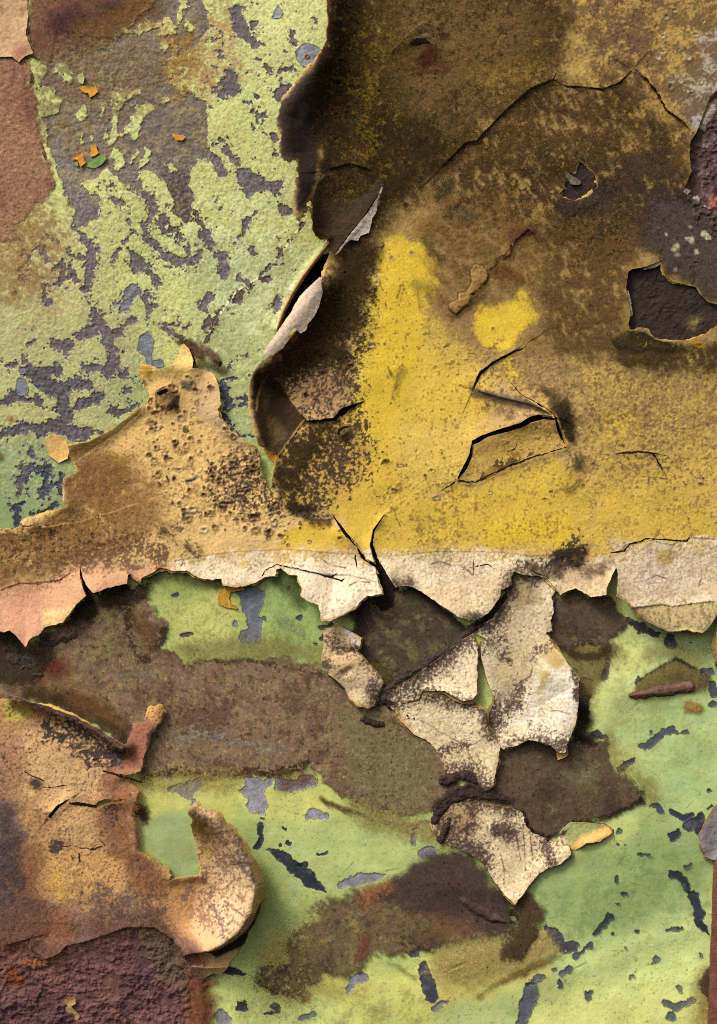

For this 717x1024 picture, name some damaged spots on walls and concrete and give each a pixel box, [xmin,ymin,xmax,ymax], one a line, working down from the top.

crack [443,68,694,167]
leakage [312,0,695,367]
peeling [0,0,717,791]
crack [473,346,526,389]
crack [442,388,567,490]
crack [260,515,384,582]
rust [628,681,703,713]
rust [106,779,166,895]
peeling [0,695,386,982]
peeling [411,798,626,906]
peeling [649,788,717,935]
rust [0,845,218,1024]